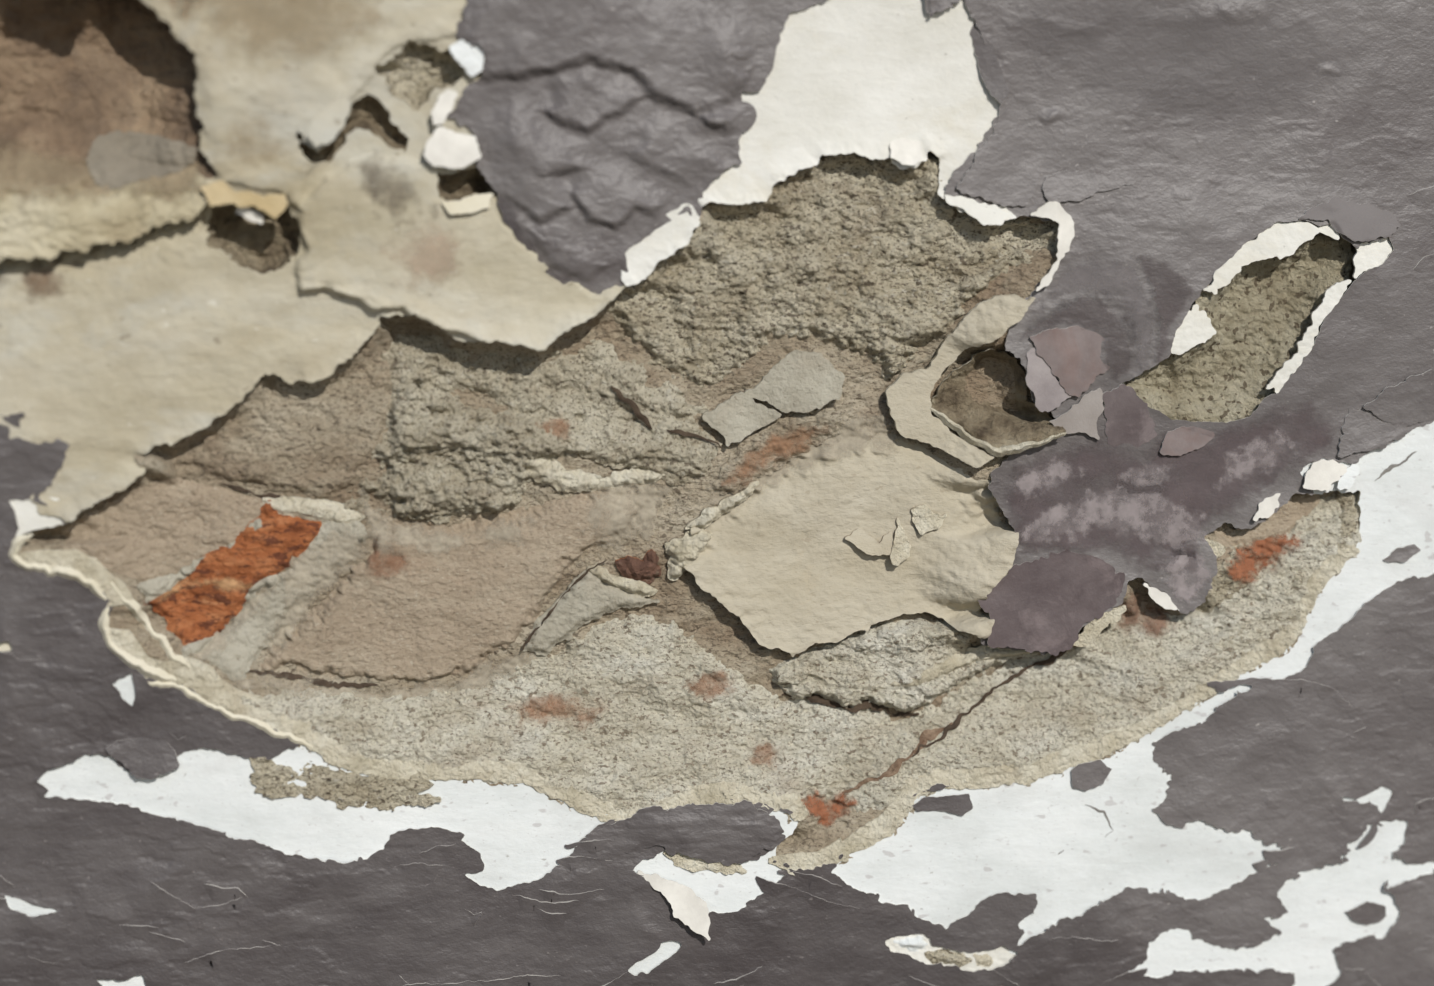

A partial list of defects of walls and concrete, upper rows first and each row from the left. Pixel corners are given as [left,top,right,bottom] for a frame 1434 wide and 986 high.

peeling [698,0,1017,225]
flaking render [0,0,700,537]
flaking render [5,151,1393,945]
peeling [1237,421,1434,680]
crack [781,627,1084,798]